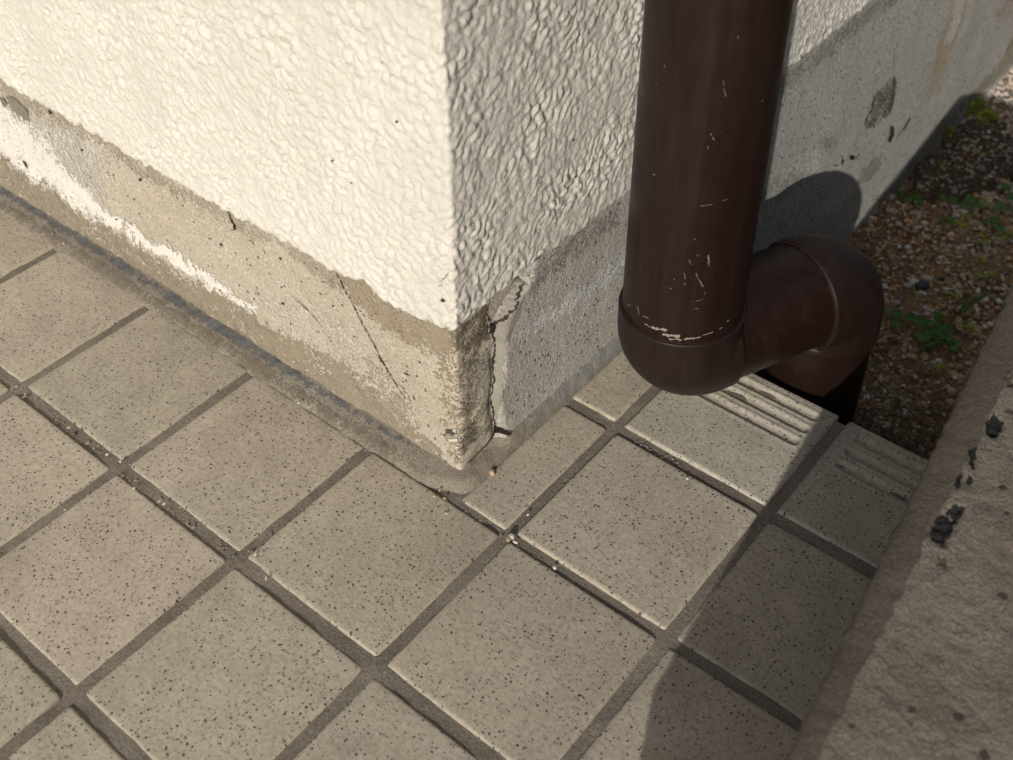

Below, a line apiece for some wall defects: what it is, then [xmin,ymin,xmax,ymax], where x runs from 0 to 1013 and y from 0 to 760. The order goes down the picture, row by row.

leakage [0,79,499,485]
crack [336,274,405,399]
crack [468,283,525,463]